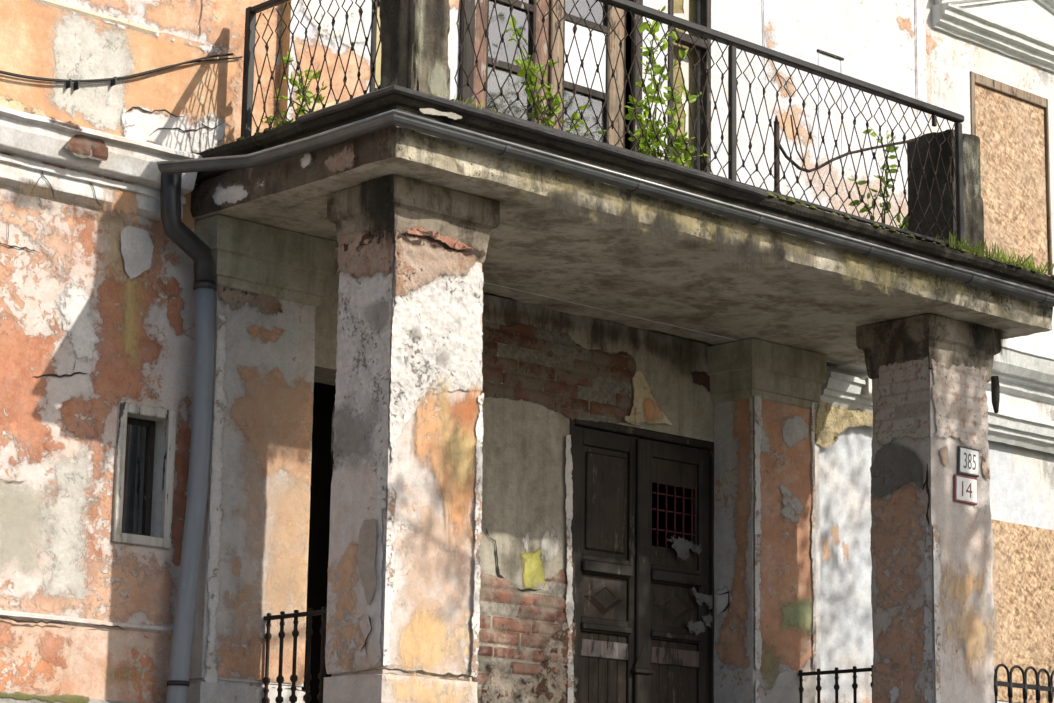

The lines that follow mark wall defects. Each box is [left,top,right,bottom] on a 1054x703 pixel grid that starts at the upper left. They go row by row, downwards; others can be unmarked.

peeling [43,0,282,153]
peeling [291,0,370,121]
leakage [381,0,399,79]
leakage [427,0,447,57]
peeling [766,24,908,234]
leakage [552,191,688,245]
leakage [705,224,788,268]
crack [33,360,96,381]
leakage [970,322,1006,363]
peeling [204,286,314,684]
spalling [325,226,673,703]
peeling [715,356,992,703]